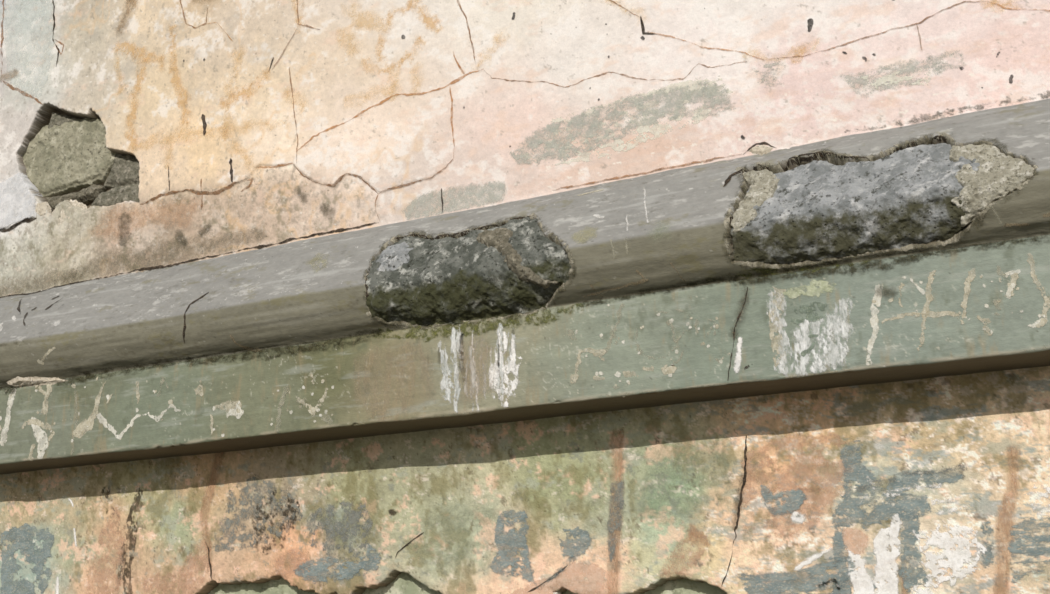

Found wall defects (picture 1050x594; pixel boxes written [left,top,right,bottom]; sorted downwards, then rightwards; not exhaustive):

flaking render [0,112,140,229]
crack [0,0,1050,298]
spalling [364,182,576,329]
spalling [723,133,1038,378]
damp [438,323,522,412]
crack [728,287,748,378]
peeling [208,477,381,594]
flaking render [363,572,442,594]
peeling [491,481,624,594]
flaking render [642,551,727,594]
crack [722,435,747,584]